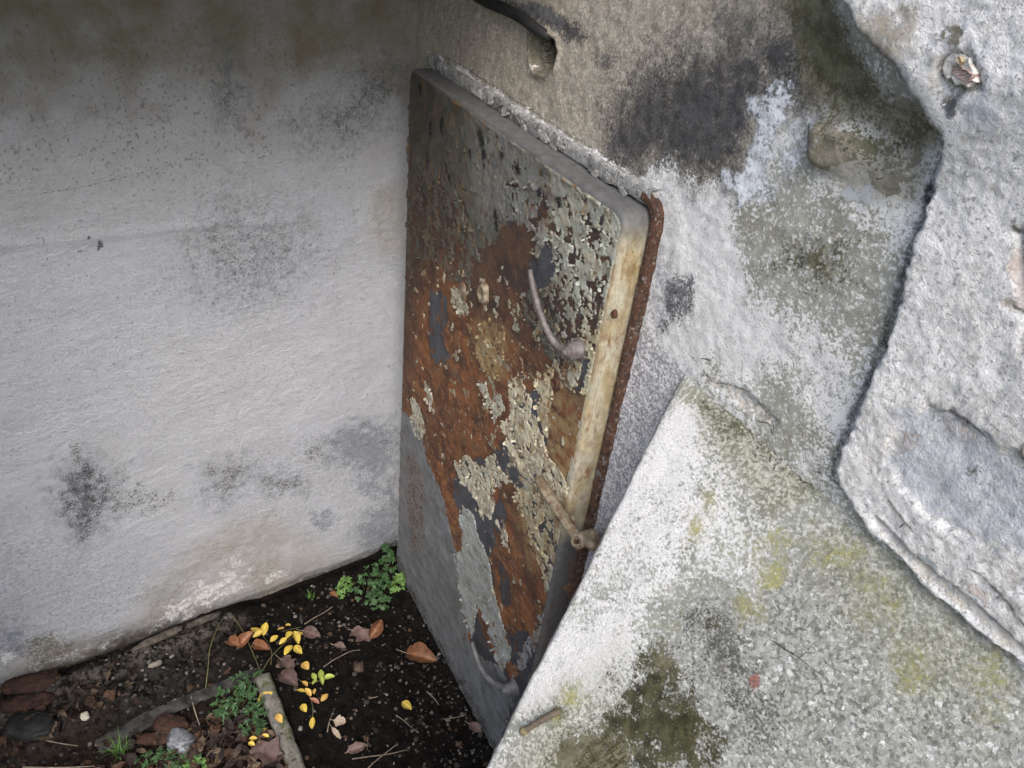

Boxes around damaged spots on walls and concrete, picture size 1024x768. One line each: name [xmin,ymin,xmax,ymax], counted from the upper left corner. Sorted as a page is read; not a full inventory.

peeling [428,48,572,151]
peeling [585,145,641,203]
leakage [506,0,941,374]
corrosion [402,77,615,552]
peeling [397,73,621,748]
mould [56,441,175,546]
mould [305,421,399,551]
corrosion [463,477,549,682]
leakage [647,636,714,766]